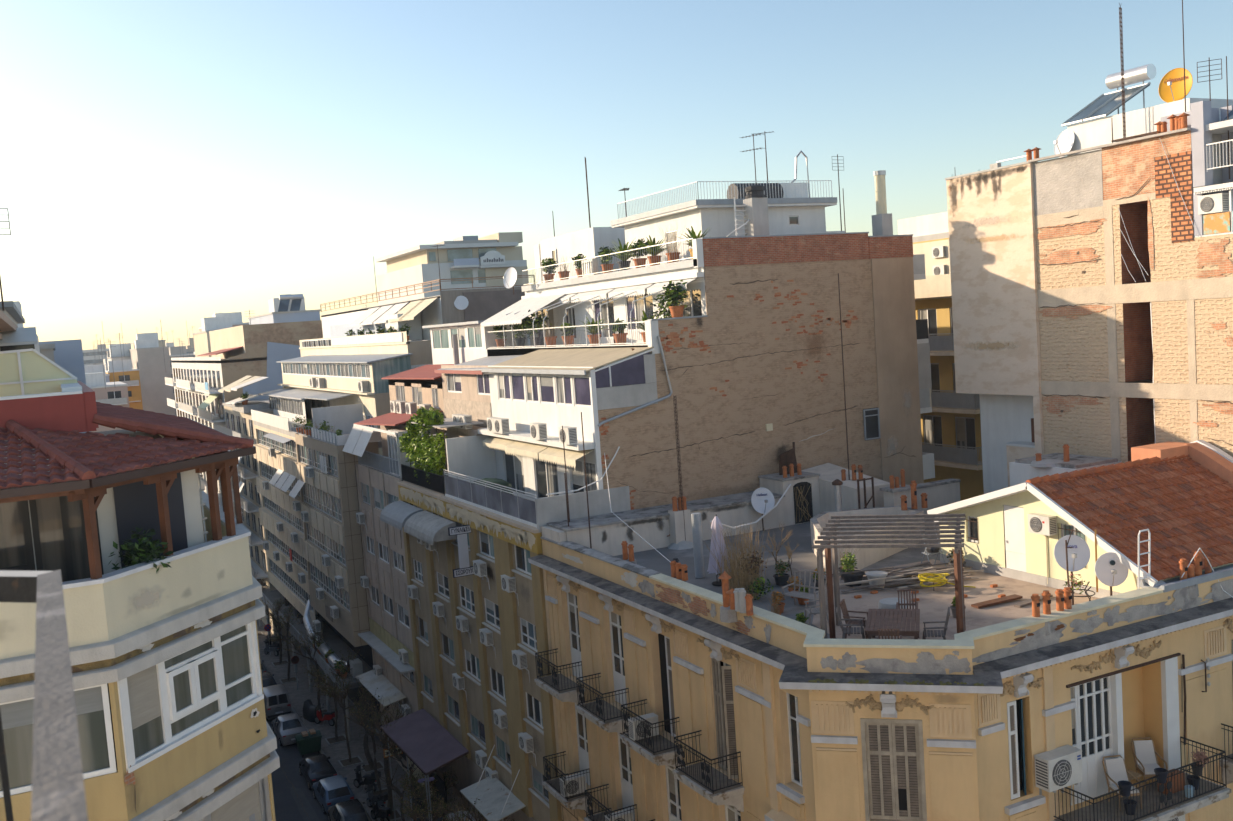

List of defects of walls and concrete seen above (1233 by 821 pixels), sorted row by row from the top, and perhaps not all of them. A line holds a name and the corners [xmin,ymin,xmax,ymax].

leakage [950,167,1025,205]
spalling [1037,218,1107,274]
crack [661,343,859,373]
spalling [820,579,1233,674]